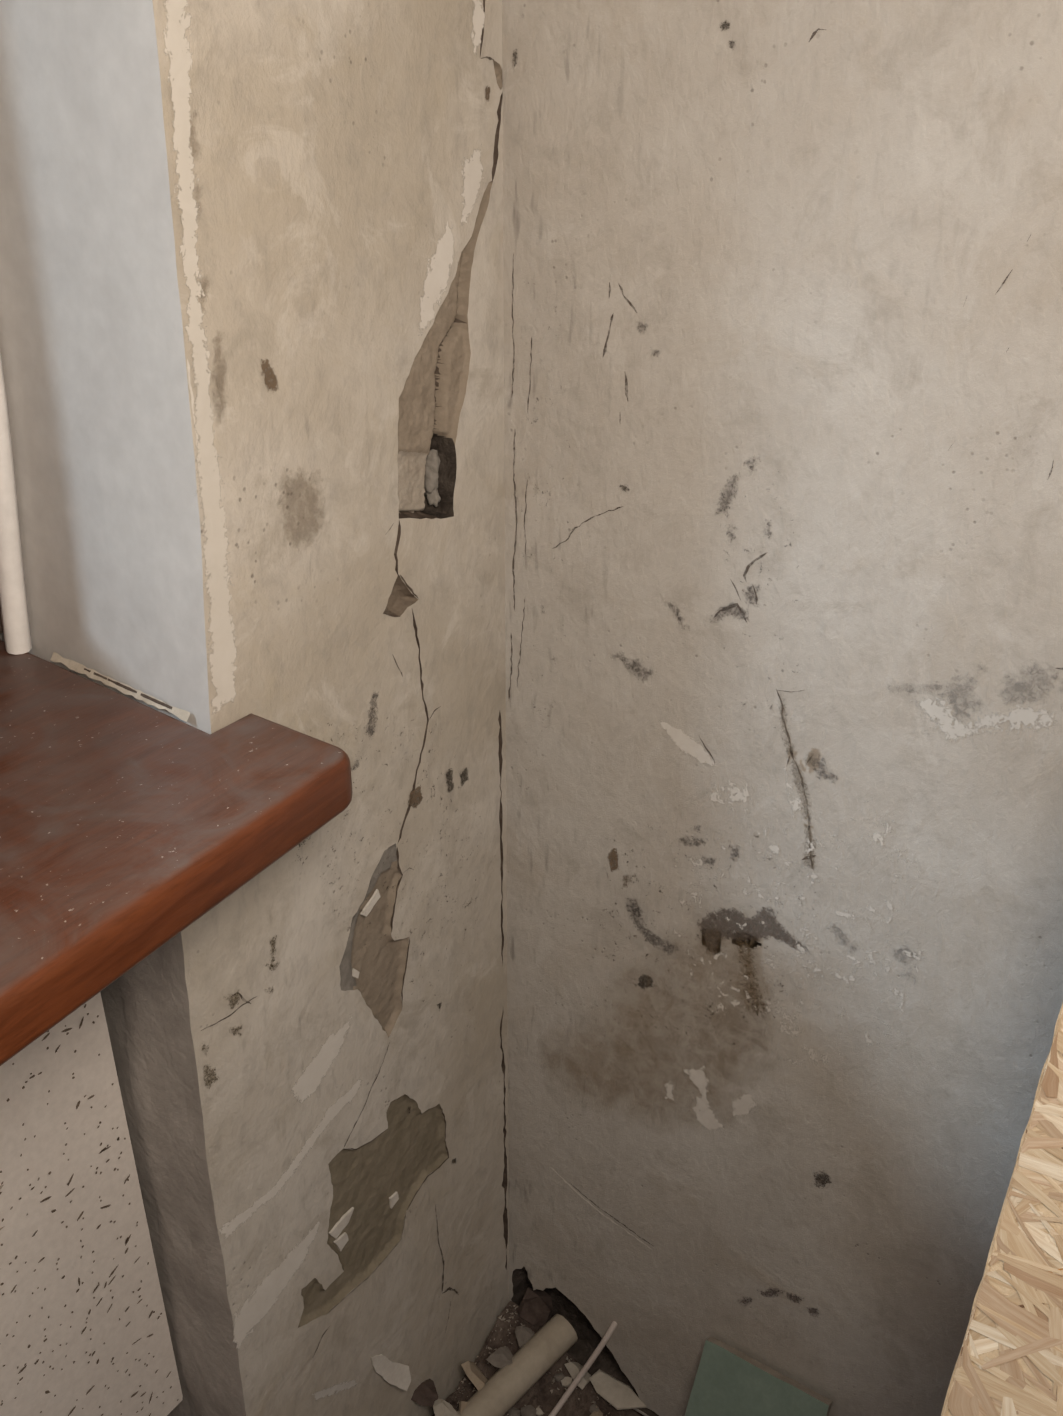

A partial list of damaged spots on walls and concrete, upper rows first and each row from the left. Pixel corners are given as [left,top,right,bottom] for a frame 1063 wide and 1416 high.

crack [491,94,502,182]
flaking render [397,182,493,519]
crack [385,521,401,575]
flaking render [383,574,419,617]
crack [498,254,621,963]
crack [392,610,441,870]
flaking render [339,843,410,1038]
damp [630,953,665,988]
damp [688,890,804,1019]
flaking render [298,1094,449,1328]
crack [500,1013,508,1270]
flaking render [511,1267,659,1416]